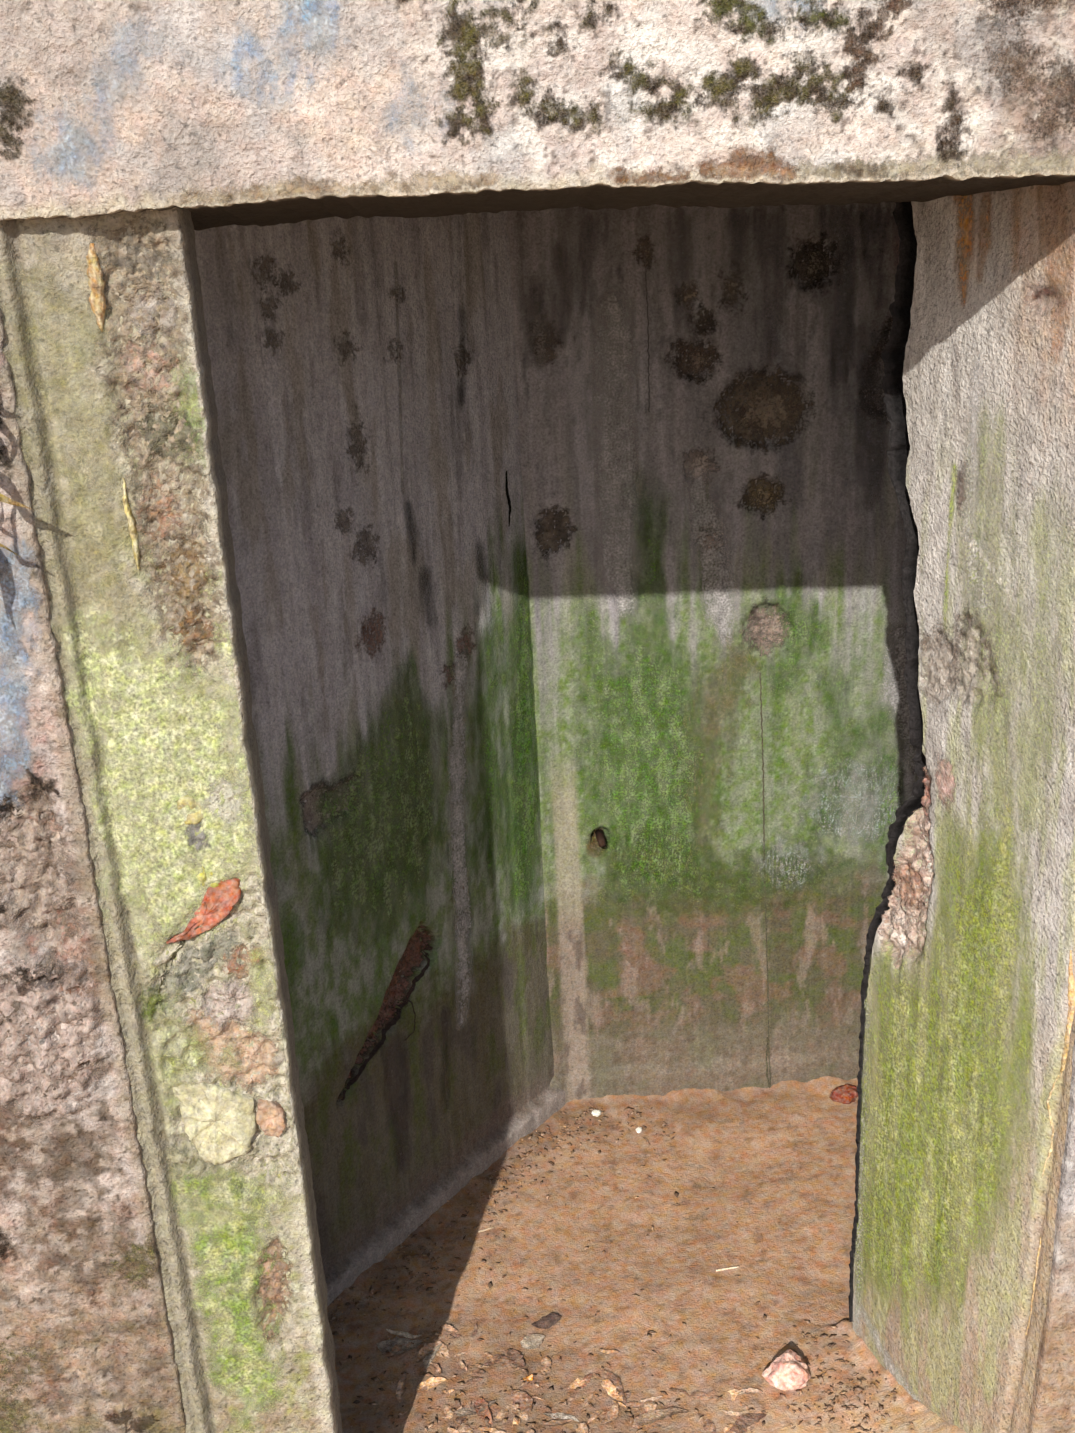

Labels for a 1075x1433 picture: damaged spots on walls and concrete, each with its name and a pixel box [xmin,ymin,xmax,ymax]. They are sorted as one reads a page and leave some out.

leakage [395,264,430,601]
leakage [441,546,540,1095]
leakage [690,467,747,842]
leakage [770,584,819,690]
leakage [814,628,916,871]
crack [848,201,927,1322]
corrosion [955,195,990,304]
leakage [855,978,915,1400]
peeling [856,759,1029,1324]
leakage [927,832,1012,1284]